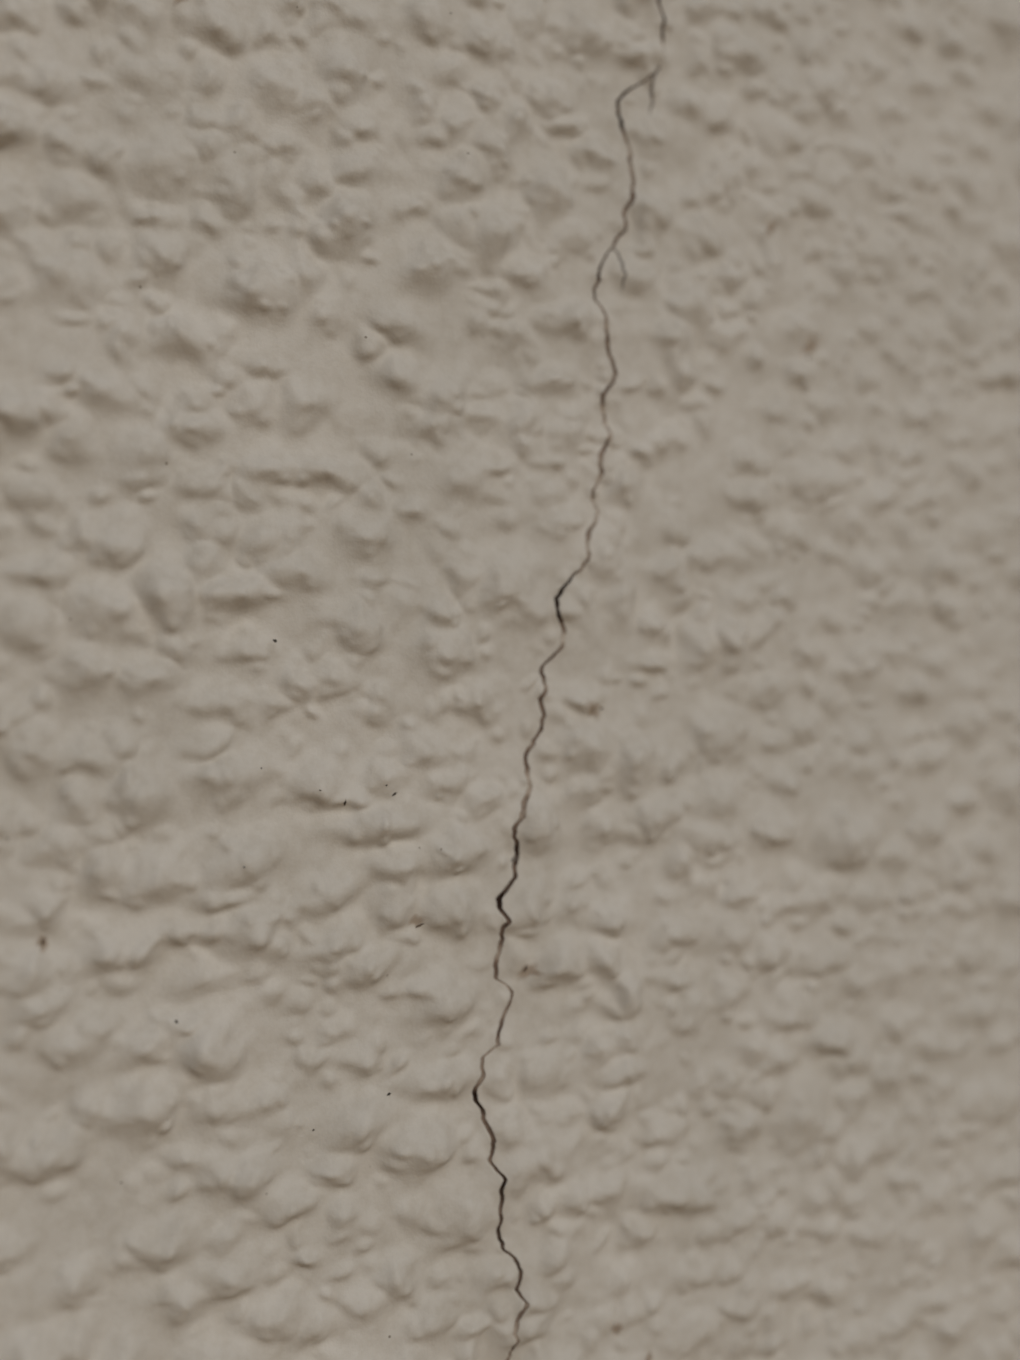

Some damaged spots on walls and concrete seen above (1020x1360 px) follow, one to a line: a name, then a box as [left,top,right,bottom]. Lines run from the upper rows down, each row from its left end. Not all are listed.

crack [472,0,666,1360]